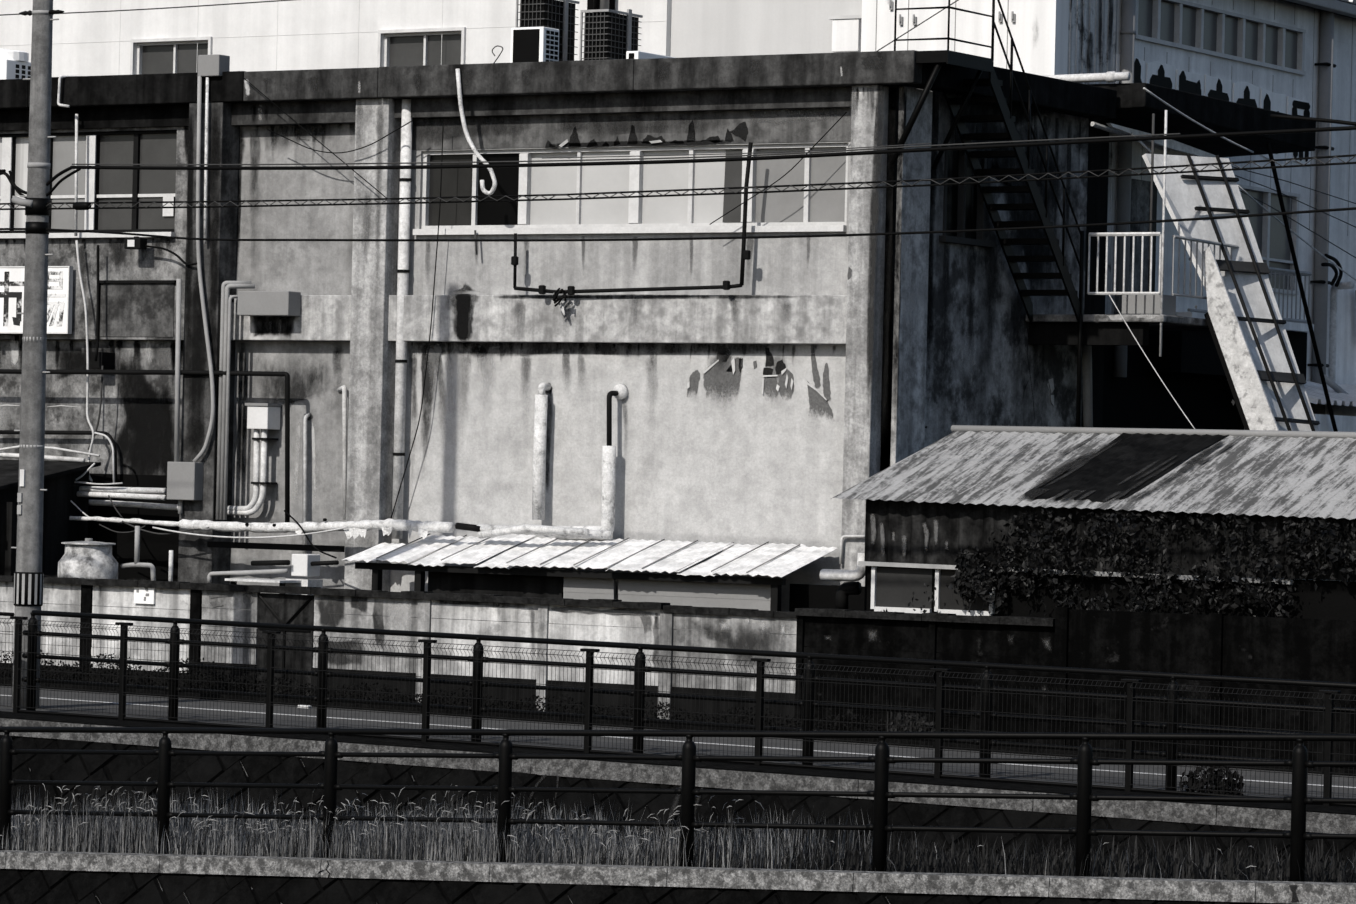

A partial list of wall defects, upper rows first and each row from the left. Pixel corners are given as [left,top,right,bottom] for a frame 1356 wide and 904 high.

leakage [236,79,361,264]
leakage [365,112,382,239]
peeling [545,113,748,149]
leakage [55,116,220,475]
leakage [238,316,295,478]
leakage [264,347,342,492]
leakage [410,284,789,438]
peeling [687,345,833,418]